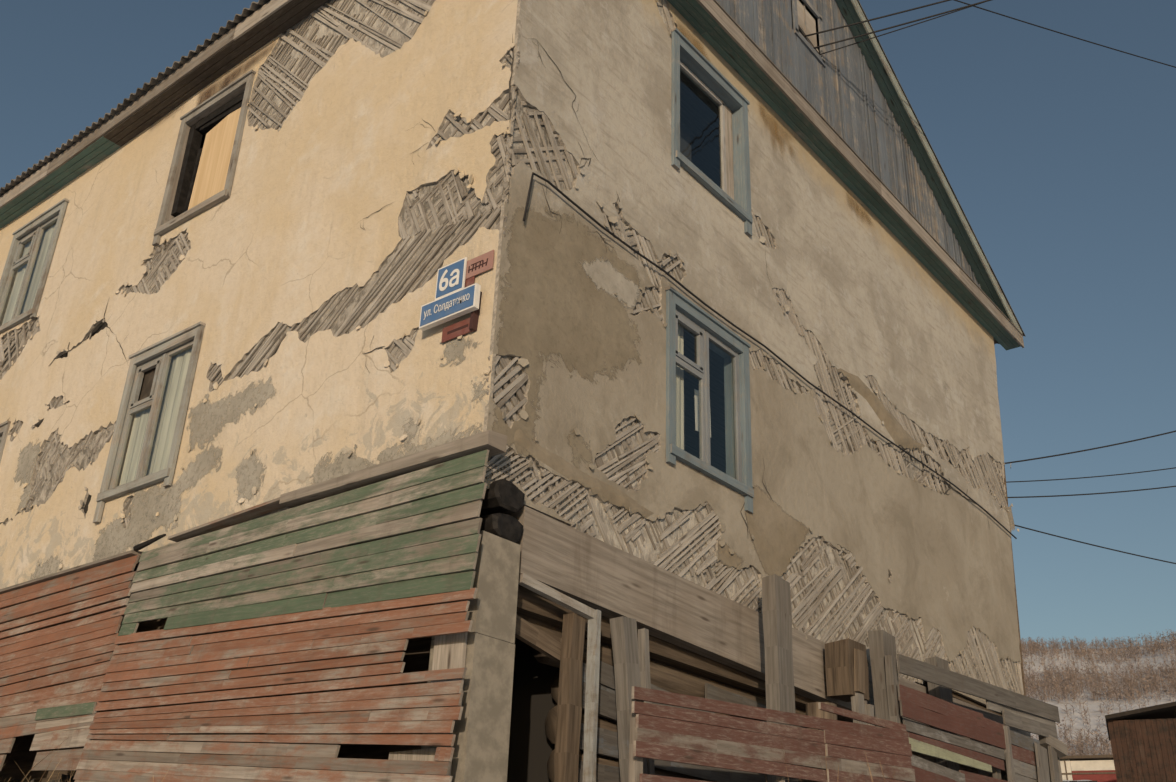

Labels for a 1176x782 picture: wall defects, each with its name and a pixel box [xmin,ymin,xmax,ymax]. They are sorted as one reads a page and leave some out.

crack [49,300,128,366]
flaking render [5,396,116,524]
peeling [745,481,813,577]